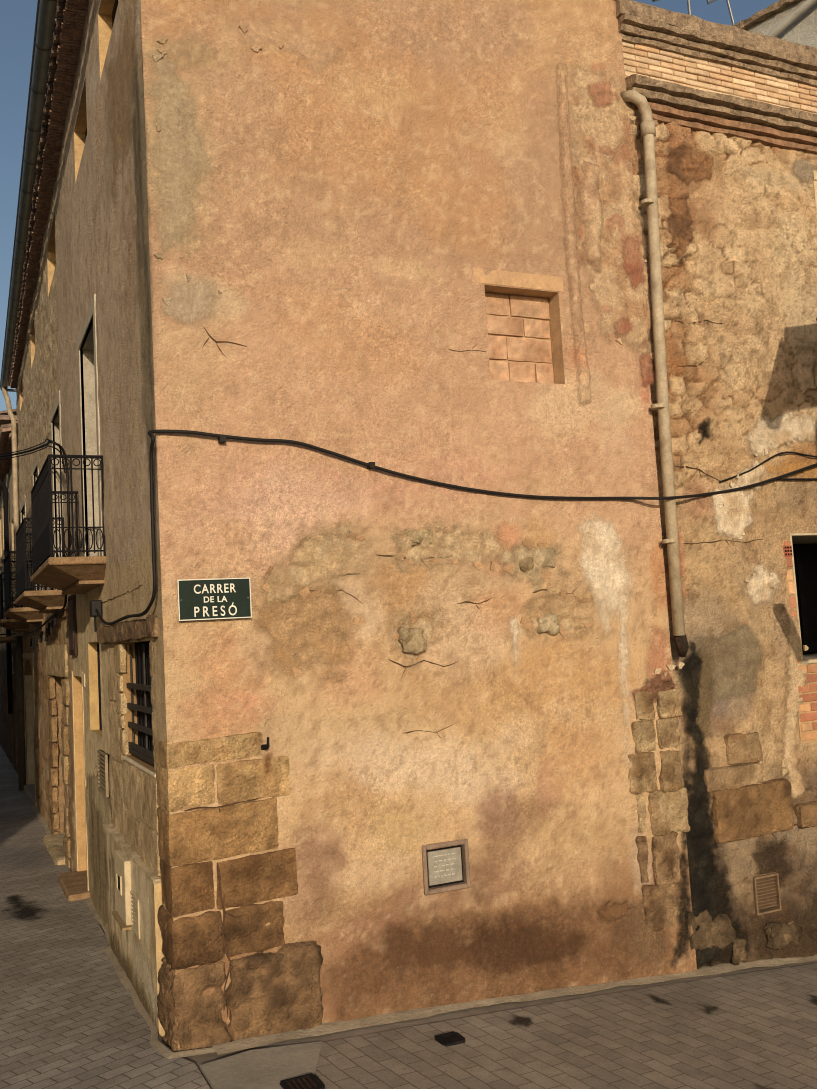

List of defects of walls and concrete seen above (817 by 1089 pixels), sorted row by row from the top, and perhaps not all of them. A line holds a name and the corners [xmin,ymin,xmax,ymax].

spalling [667,143,714,263]
crack [202,326,247,356]
spalling [698,419,713,443]
flaking render [255,524,368,681]
flaking render [390,607,444,663]
crack [388,659,457,678]
flaking render [393,524,593,639]
water stain [578,519,631,720]
water stain [329,642,817,1020]